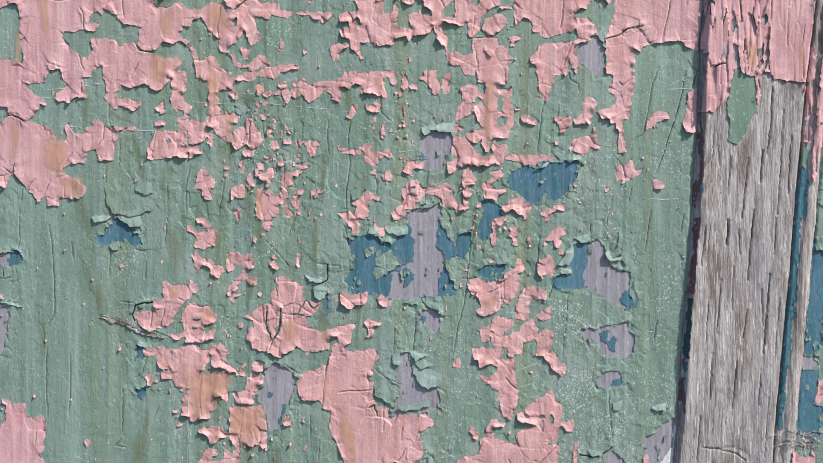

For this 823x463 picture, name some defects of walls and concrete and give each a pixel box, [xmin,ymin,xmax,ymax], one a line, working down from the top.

peeling [0,0,451,250]
crack [656,63,725,172]
peeling [330,0,823,463]
peeling [0,398,47,463]
peeling [101,275,442,463]